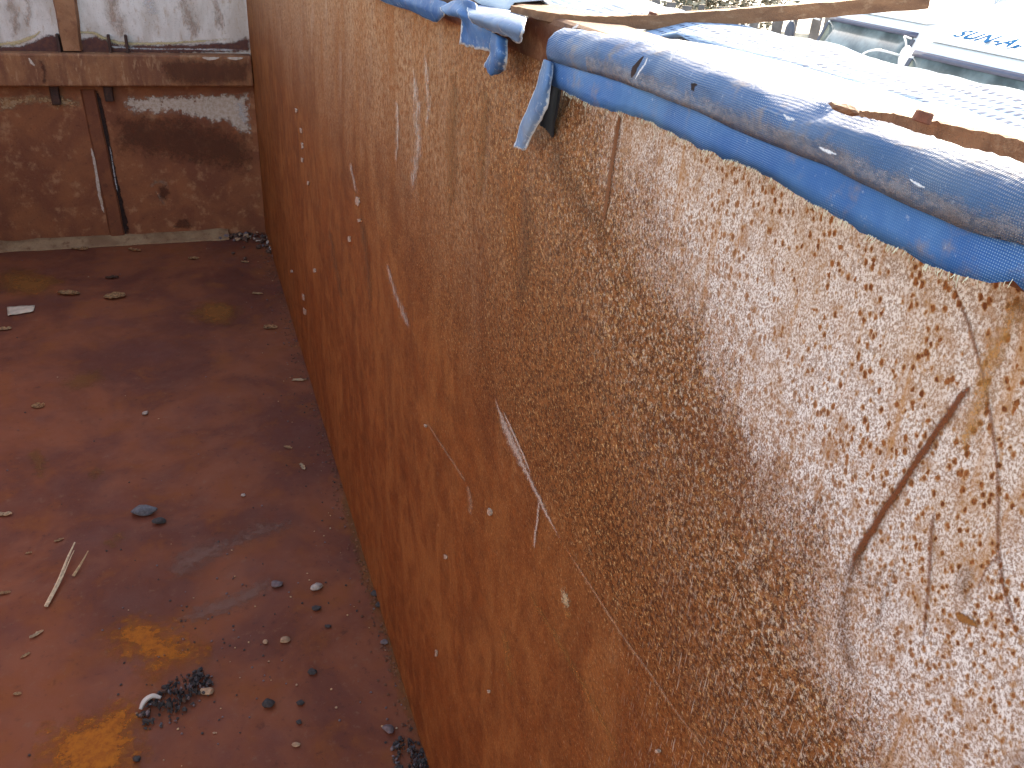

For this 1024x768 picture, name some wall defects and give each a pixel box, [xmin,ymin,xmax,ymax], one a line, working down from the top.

corrosion [0,0,249,83]
peeling [124,94,251,134]
corrosion [603,116,620,224]
corrosion [961,304,1020,445]
corrosion [114,619,209,671]
corrosion [956,613,977,628]
corrosion [45,702,138,768]